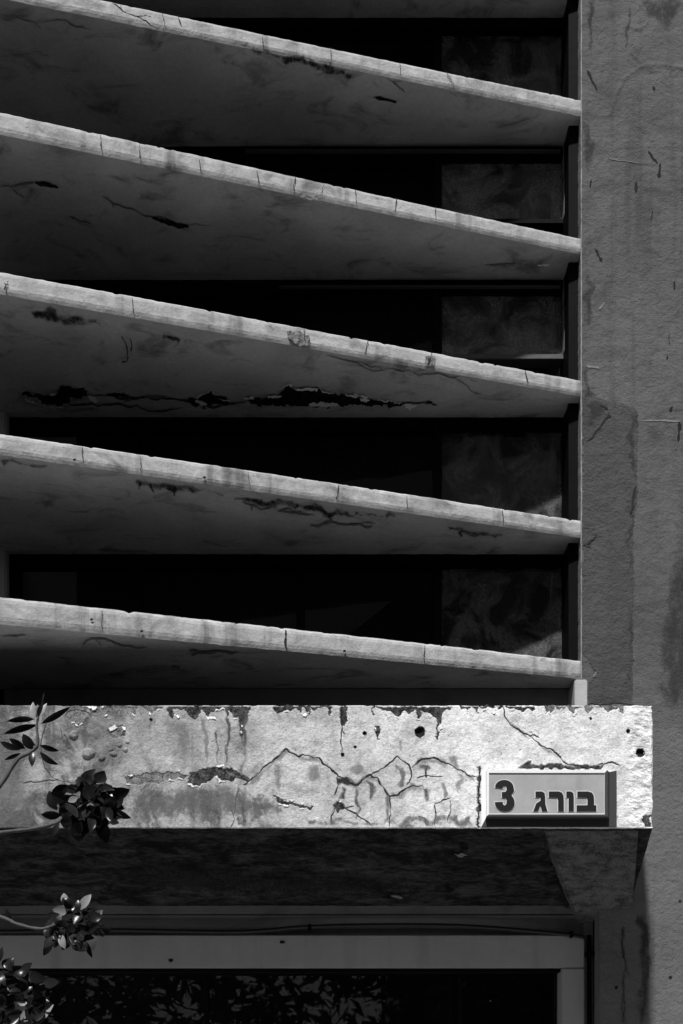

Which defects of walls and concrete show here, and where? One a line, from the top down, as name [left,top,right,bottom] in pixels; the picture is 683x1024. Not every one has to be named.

crack [103,197,151,217]
crack [304,330,482,395]
spalling [21,386,167,408]
spalling [182,390,231,409]
spalling [244,383,433,411]
crack [243,474,376,529]
peeling [273,704,349,726]
leakage [202,711,248,758]
crack [502,706,622,769]
spalling [125,764,249,787]
crack [227,705,476,827]